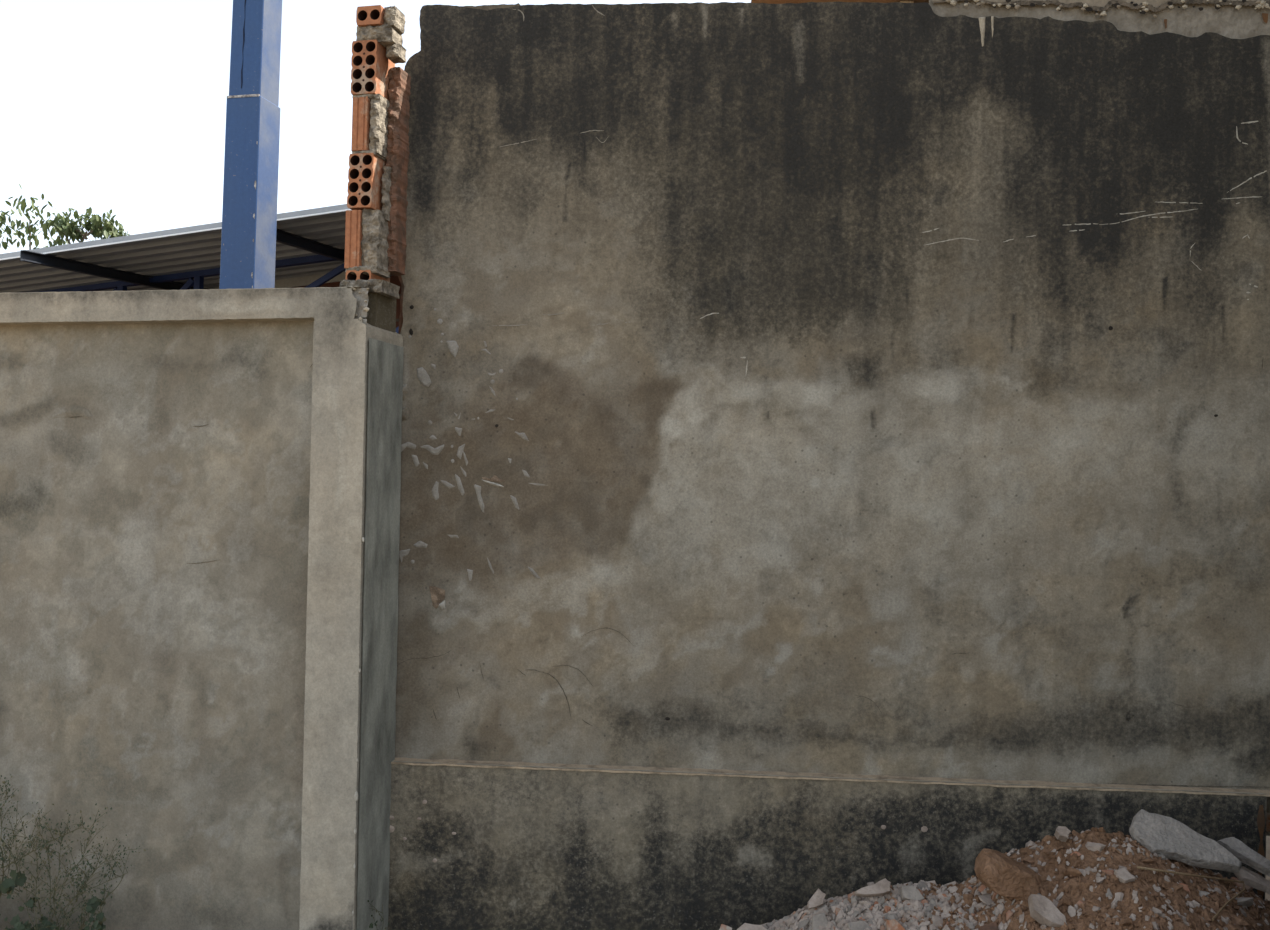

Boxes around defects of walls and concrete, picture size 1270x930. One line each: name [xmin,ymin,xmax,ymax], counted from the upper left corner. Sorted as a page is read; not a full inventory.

spalling [385,67,411,276]
spalling [349,286,370,325]
peeling [401,369,519,512]
damp [356,1,1270,930]